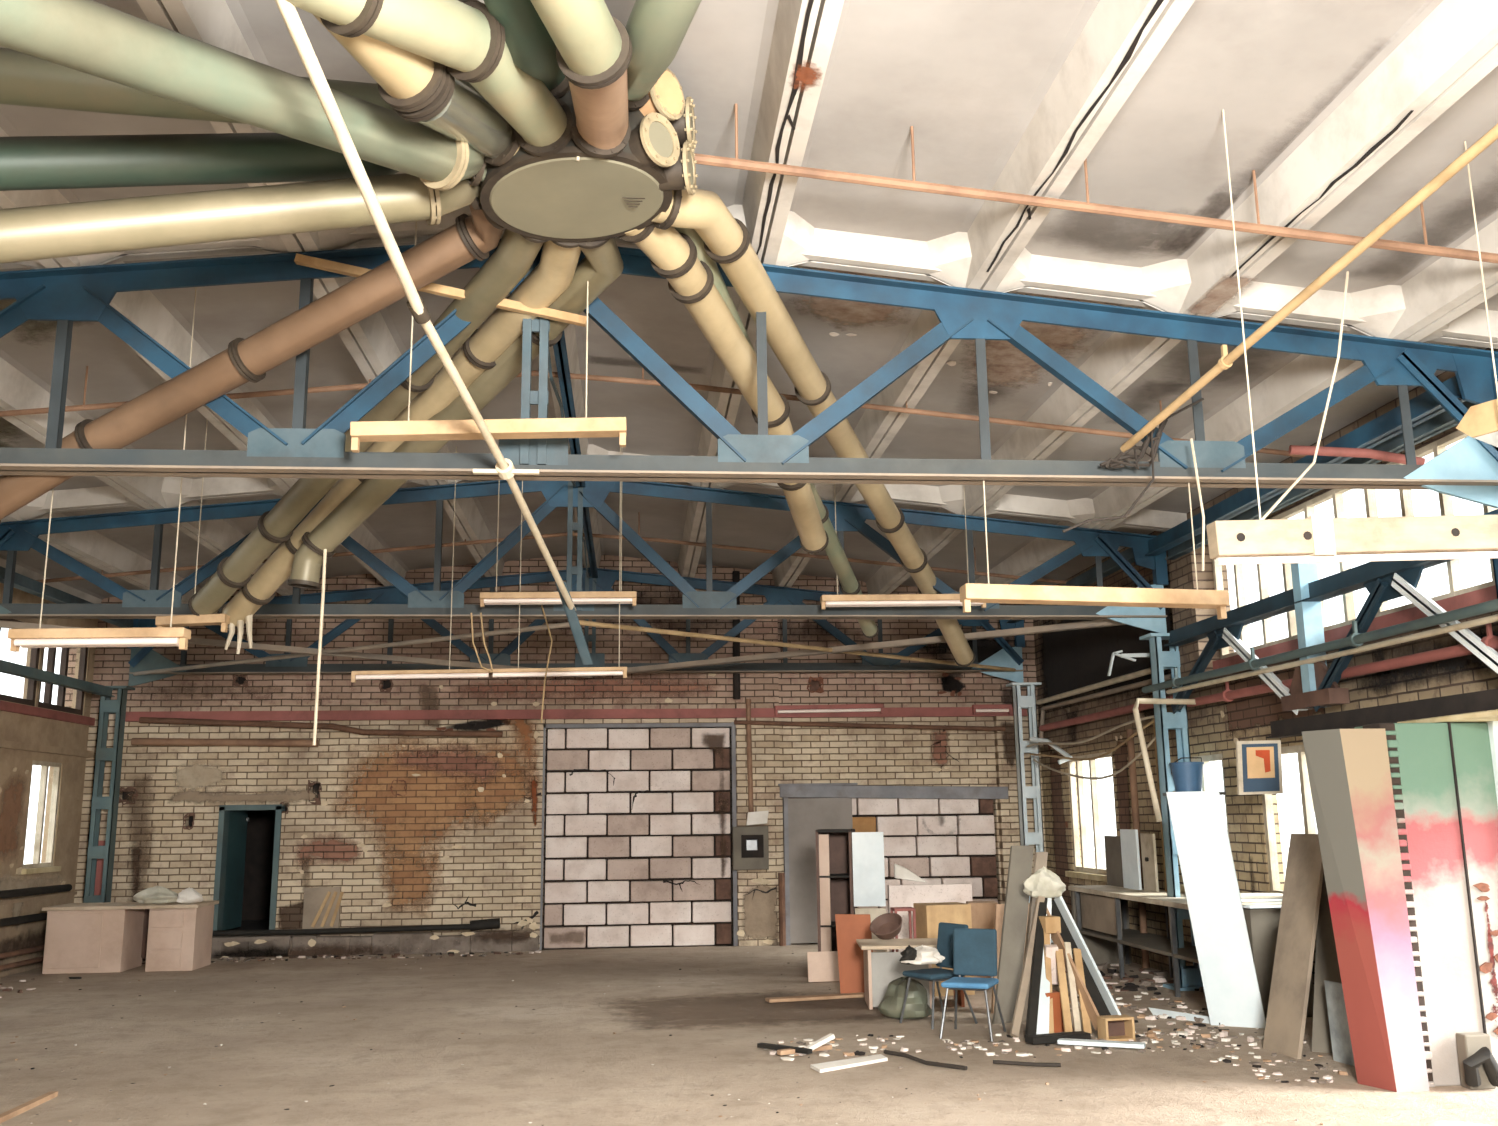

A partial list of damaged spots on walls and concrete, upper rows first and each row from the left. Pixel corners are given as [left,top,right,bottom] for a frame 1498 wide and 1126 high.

peeling [0,767,42,917]
peeling [297,673,716,910]